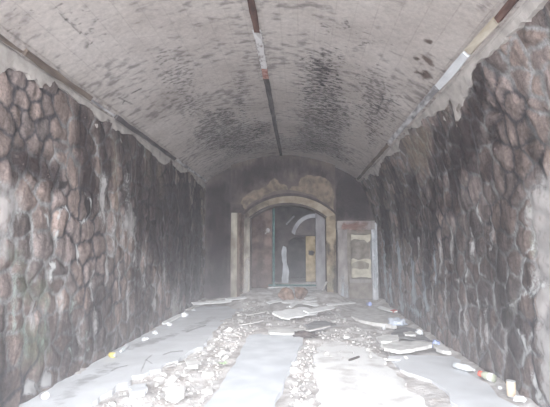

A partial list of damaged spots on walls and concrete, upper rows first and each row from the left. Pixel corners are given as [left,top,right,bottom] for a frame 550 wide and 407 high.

water stain [76,108,111,222]
flaking render [0,41,205,188]
flaking render [241,175,335,210]
water stain [293,47,354,151]
flaking render [364,0,548,180]